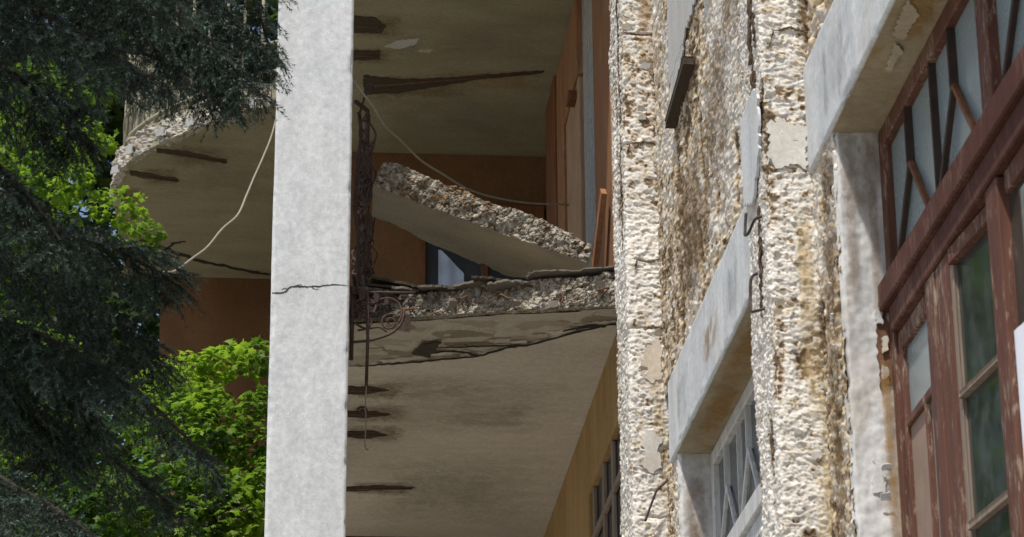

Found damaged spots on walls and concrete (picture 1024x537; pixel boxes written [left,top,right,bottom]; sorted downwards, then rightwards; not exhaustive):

spalling [885,0,920,73]
spalling [109,85,274,206]
crack [139,239,348,294]
spalling [347,0,857,537]
spalling [874,304,893,390]
spalling [872,457,892,501]